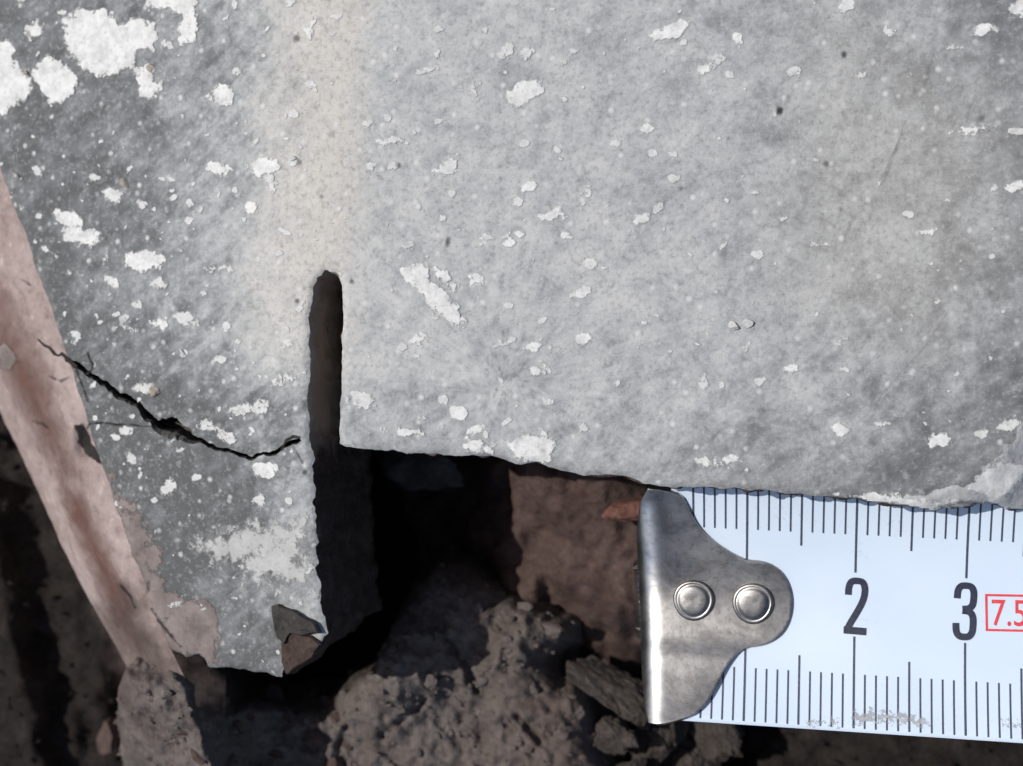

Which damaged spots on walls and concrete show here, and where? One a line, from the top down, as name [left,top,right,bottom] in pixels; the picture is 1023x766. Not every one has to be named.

leakage [0,0,199,116]
crack [37,339,303,464]